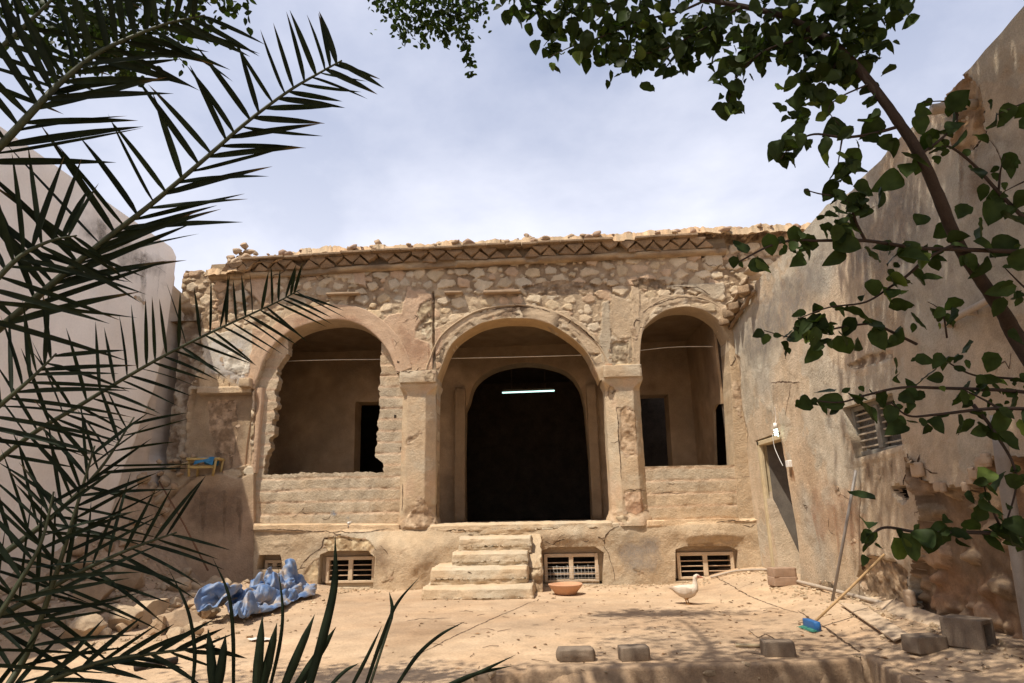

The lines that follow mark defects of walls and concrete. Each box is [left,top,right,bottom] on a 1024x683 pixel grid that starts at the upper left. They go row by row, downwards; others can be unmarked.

spalling [940,73,986,156]
spalling [417,298,434,338]
spalling [208,399,240,458]
spalling [621,406,638,457]
spalling [616,491,646,525]
crack [545,526,619,578]
spalling [858,452,1024,640]